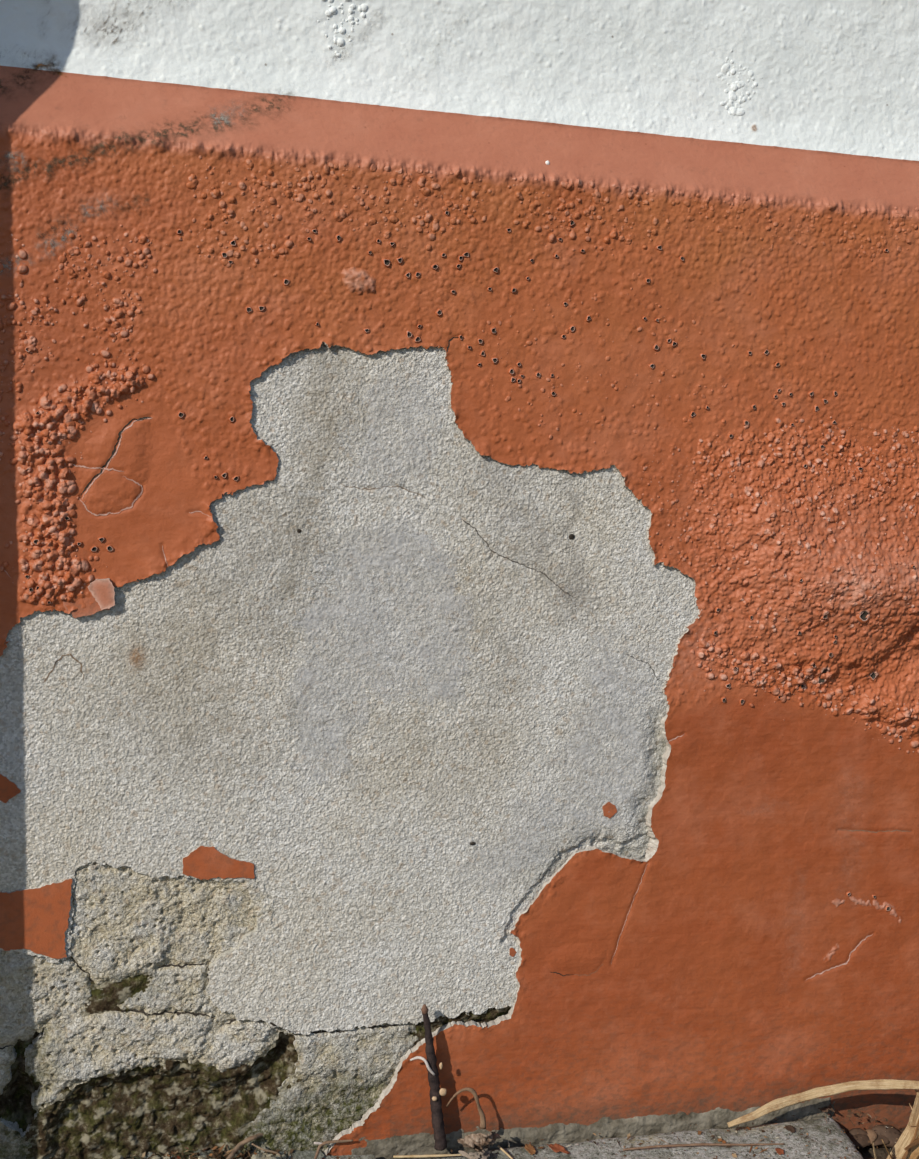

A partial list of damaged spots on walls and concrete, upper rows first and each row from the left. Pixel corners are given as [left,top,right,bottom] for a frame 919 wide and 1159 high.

crack [73,417,153,516]
peeling [0,343,700,1159]
crack [551,865,647,976]
crack [806,934,873,980]